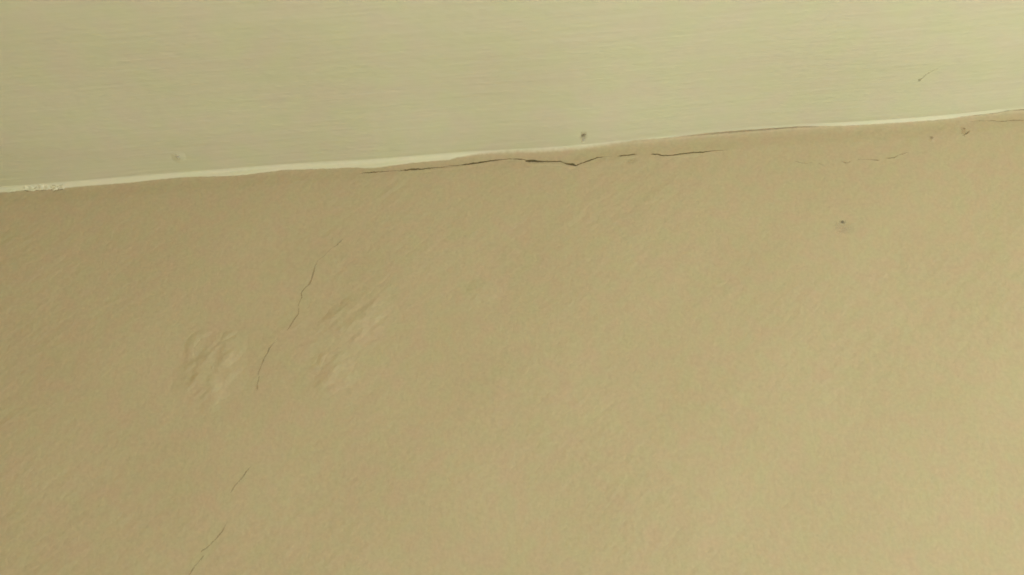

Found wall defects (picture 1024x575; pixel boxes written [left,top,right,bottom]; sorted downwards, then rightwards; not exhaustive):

crack [407,151,710,173]